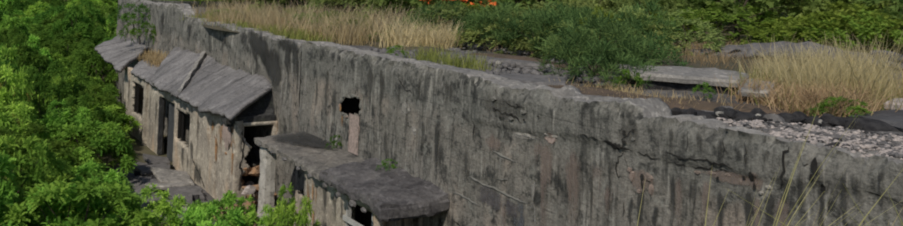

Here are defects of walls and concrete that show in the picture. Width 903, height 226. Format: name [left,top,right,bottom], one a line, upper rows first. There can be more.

water stain [241,29,335,111]
crack [581,129,747,178]
water stain [628,192,658,226]